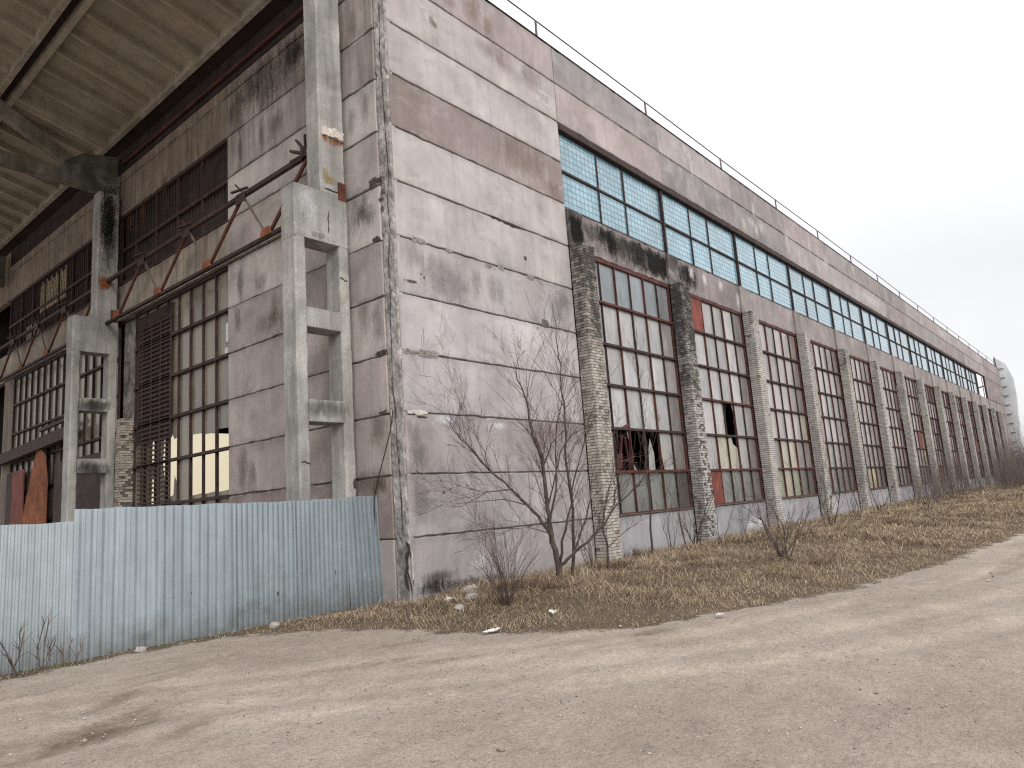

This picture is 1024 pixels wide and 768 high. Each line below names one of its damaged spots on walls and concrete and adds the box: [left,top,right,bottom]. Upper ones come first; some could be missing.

spalling [321,125,344,145]
leakage [102,199,114,258]
leakage [572,218,583,241]
leakage [597,228,706,285]
spalling [402,348,439,359]